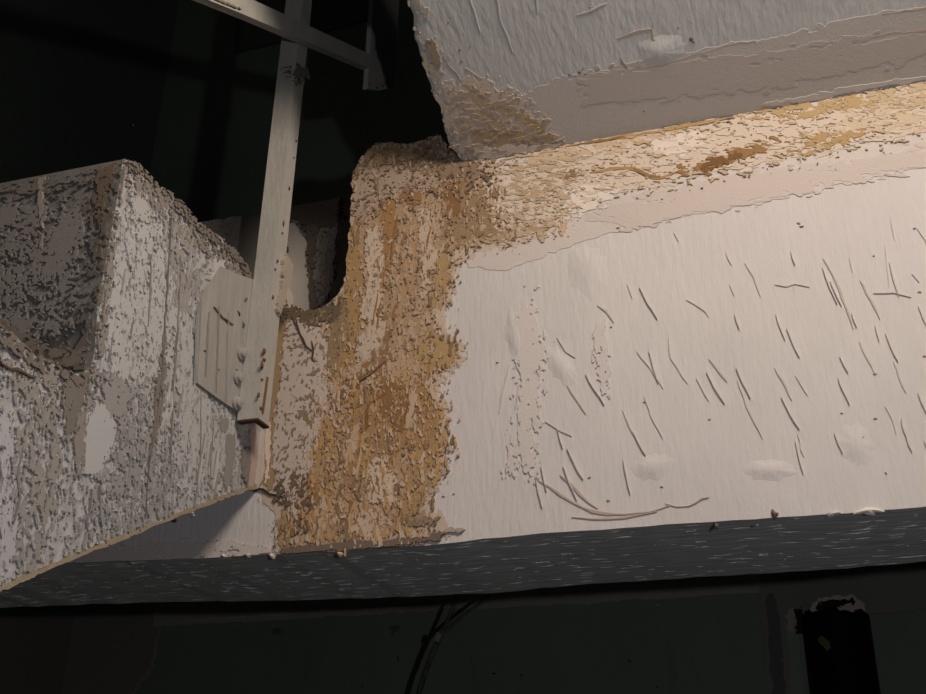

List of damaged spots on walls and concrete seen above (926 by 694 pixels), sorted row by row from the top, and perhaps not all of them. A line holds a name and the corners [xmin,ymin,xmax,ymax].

peeling [0,159,328,591]
damp [67,0,926,563]